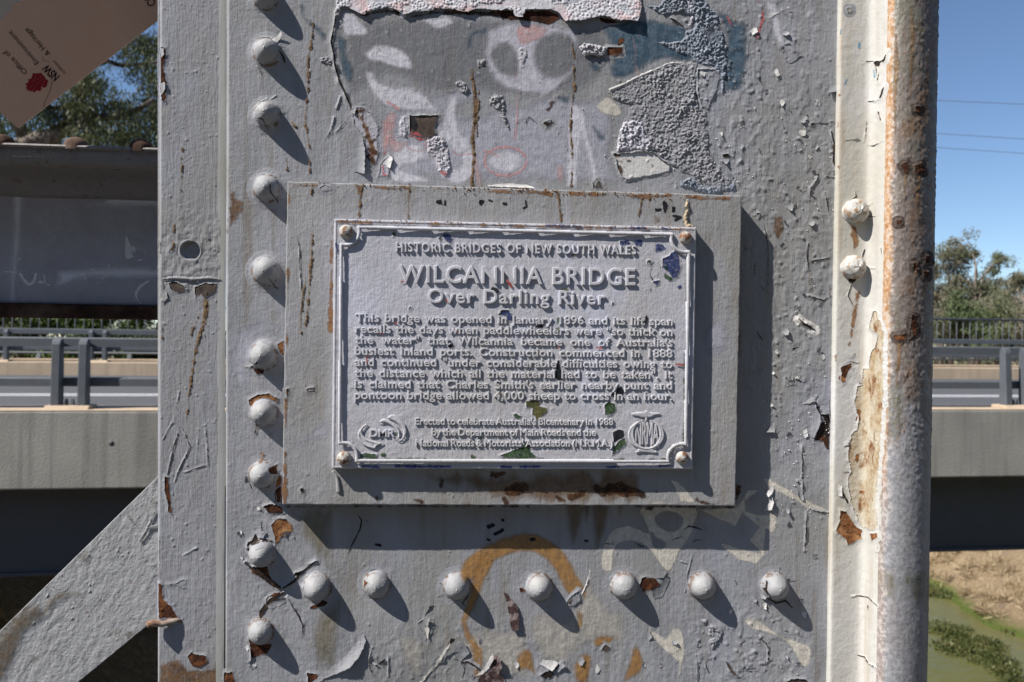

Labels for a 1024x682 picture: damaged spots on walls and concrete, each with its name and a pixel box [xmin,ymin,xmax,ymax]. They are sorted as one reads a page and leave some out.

rust [470,70,480,186]
spalling [335,0,737,195]
rust [337,183,413,224]
rust [489,172,611,229]
rust [300,232,314,334]
rust [186,299,209,414]
rust [889,311,921,384]
peeling [784,306,888,549]
peeling [241,460,310,610]
peeling [155,576,191,621]
peeling [182,648,238,682]
peeling [303,669,326,682]